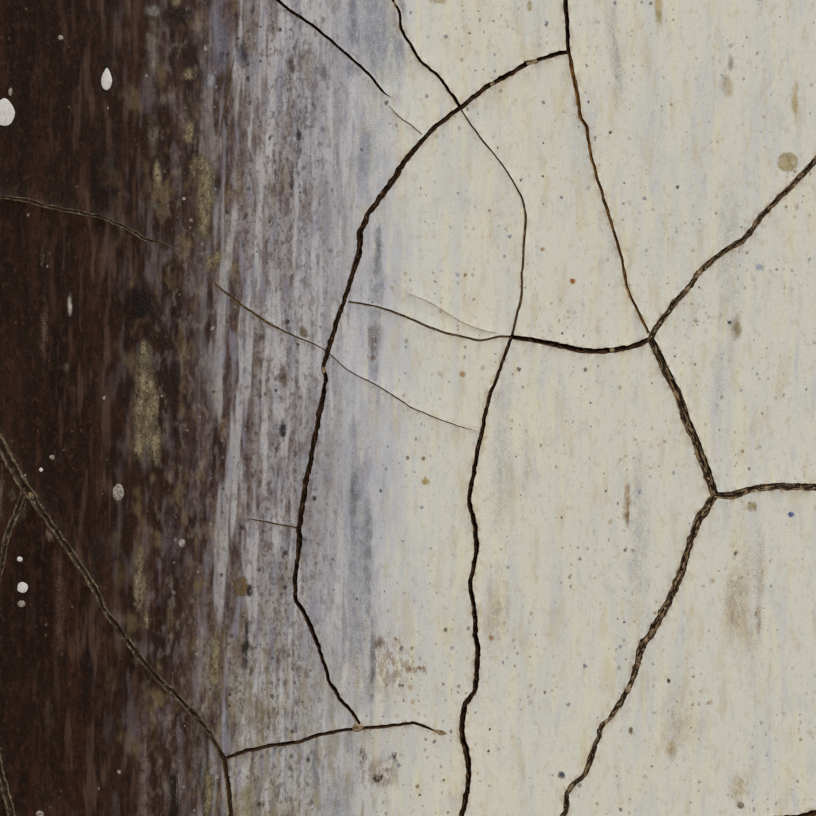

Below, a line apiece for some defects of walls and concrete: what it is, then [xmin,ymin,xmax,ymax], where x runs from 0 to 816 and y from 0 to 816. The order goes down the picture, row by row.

crack [0,196,179,251]
damp [370,256,383,379]
crack [213,0,816,816]
crack [0,434,447,816]
damp [140,726,148,816]